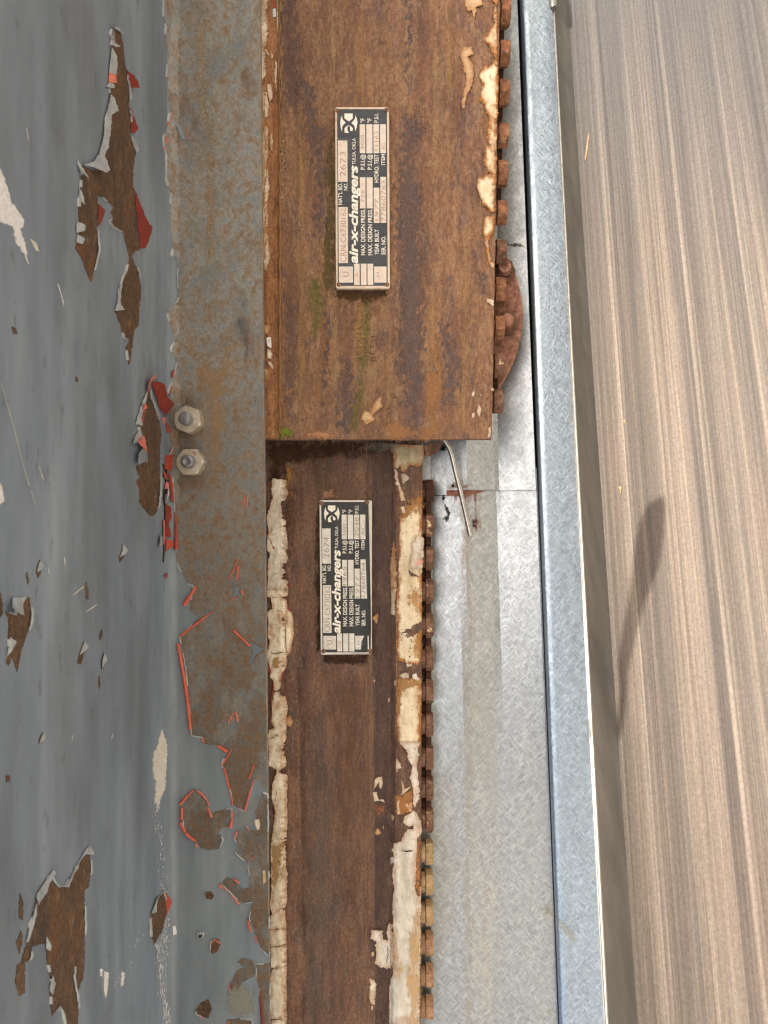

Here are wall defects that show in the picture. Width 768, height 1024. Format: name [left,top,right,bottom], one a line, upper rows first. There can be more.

peeling [75,26,153,365]
corrosion [277,0,335,242]
corrosion [304,302,363,440]
corrosion [364,104,466,445]
peeling [460,0,499,268]
peeling [0,560,44,672]
peeling [15,845,94,1024]
peeling [133,0,294,1024]
corrosion [374,787,414,816]
peeling [369,741,422,1024]
corrosion [395,678,423,747]
corrosion [395,490,425,665]